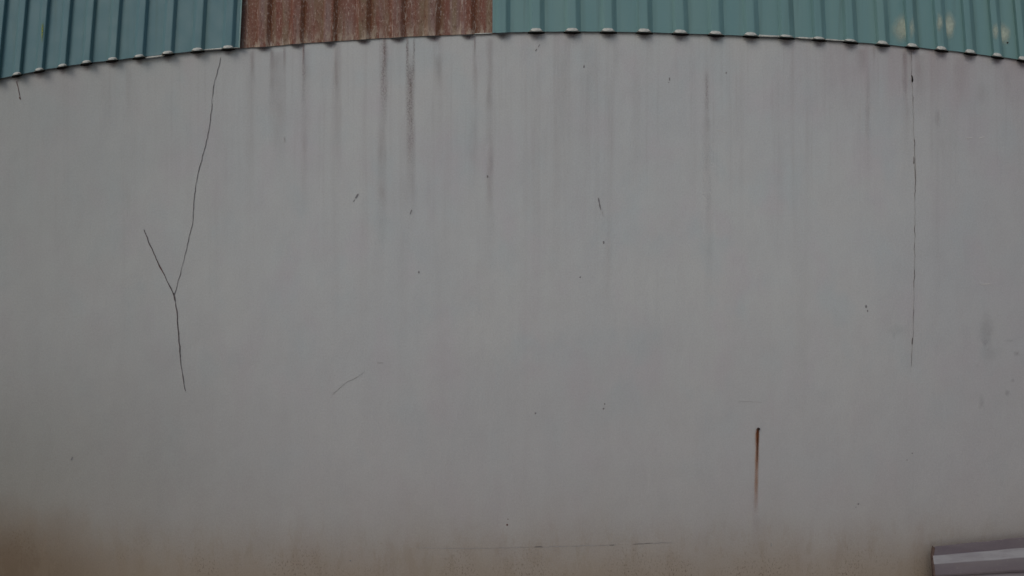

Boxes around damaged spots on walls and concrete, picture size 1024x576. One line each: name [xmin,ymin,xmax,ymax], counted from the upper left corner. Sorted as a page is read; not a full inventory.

crack [144,58,221,389]